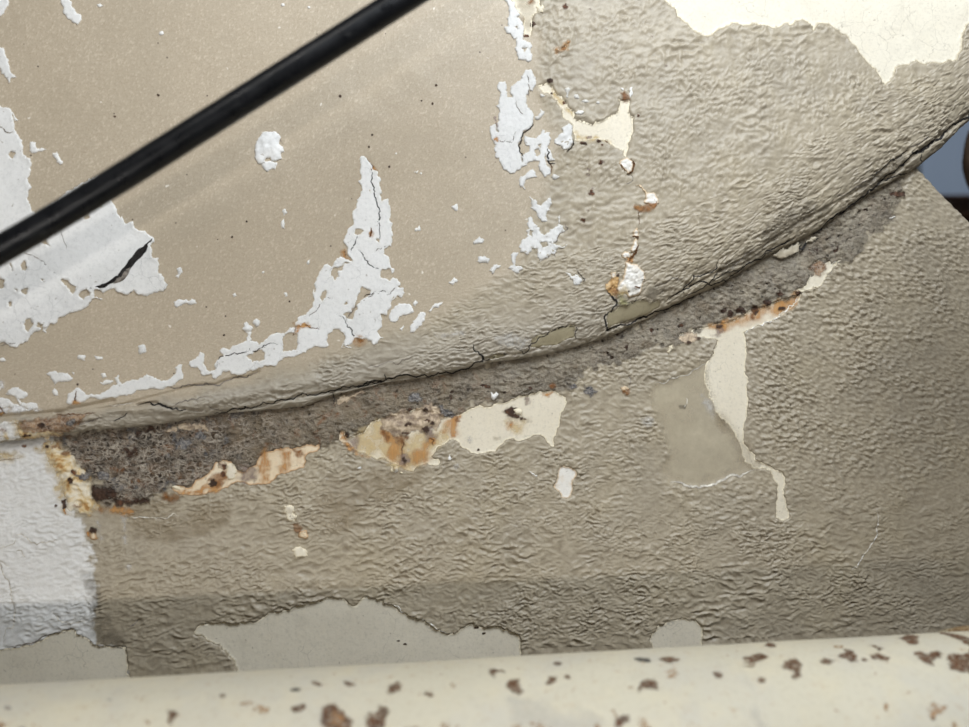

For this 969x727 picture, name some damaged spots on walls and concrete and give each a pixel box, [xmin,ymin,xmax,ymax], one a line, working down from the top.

peeling [665,0,969,85]
peeling [0,106,63,232]
peeling [0,201,167,347]
crack [96,238,153,288]
peeling [46,134,443,404]
crack [351,158,386,268]
crack [506,76,534,159]
crack [603,116,969,331]
crack [58,288,577,425]
peeling [339,391,567,474]
rust [16,178,905,540]
peeling [667,258,841,521]